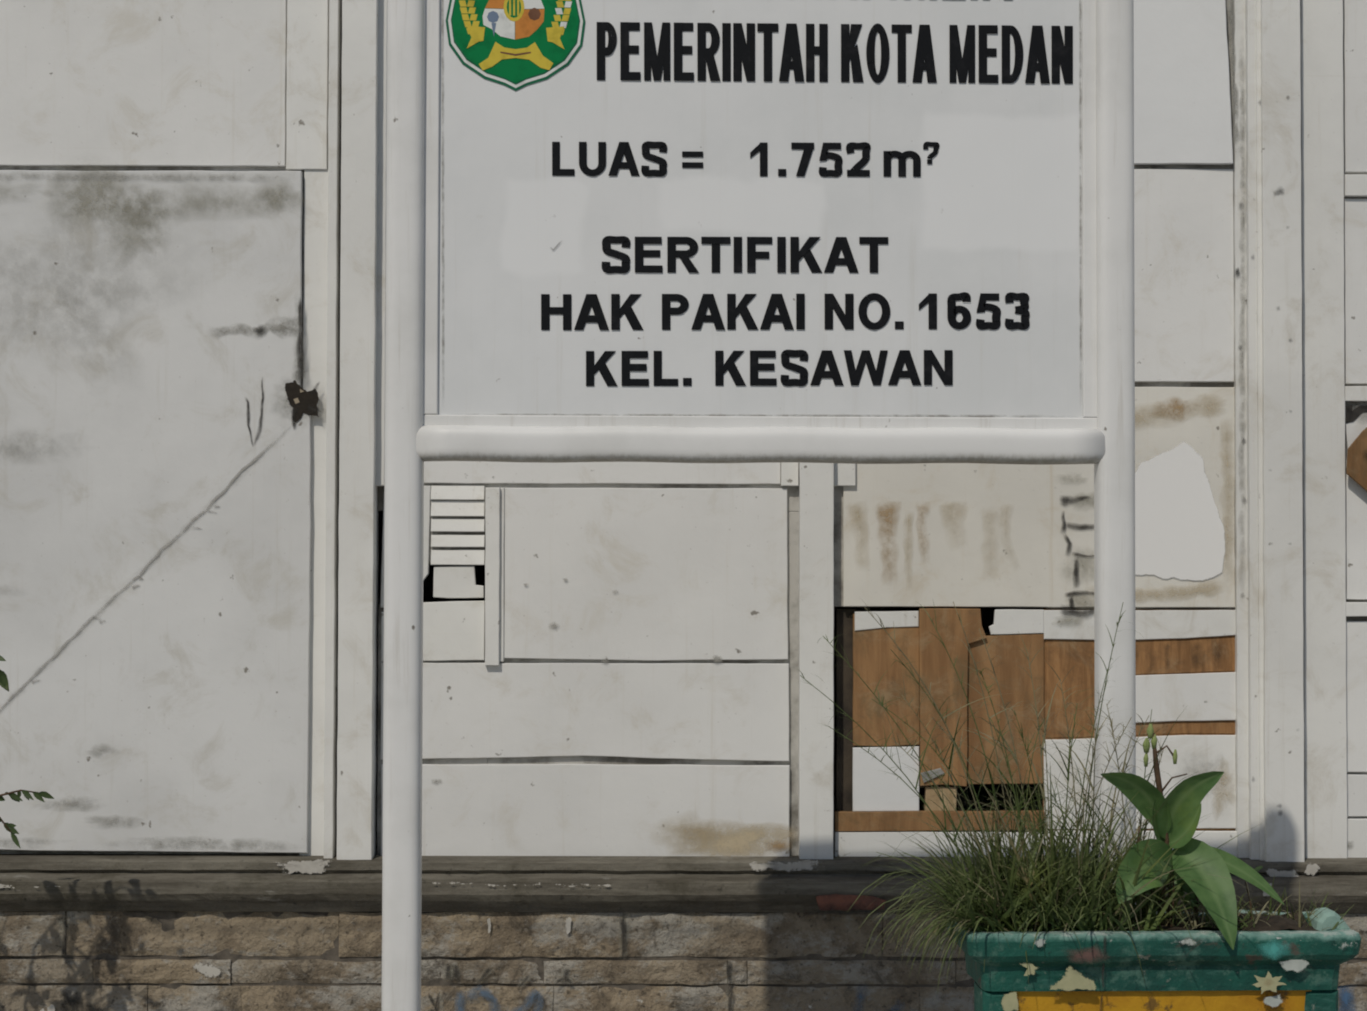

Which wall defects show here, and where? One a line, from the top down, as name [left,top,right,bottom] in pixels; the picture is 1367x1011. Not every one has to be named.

spalling [1227,0,1244,139]
damp [222,325,286,334]
crack [3,385,264,707]
peeling [1046,641,1095,738]
peeling [1135,637,1235,674]
peeling [1136,723,1235,735]